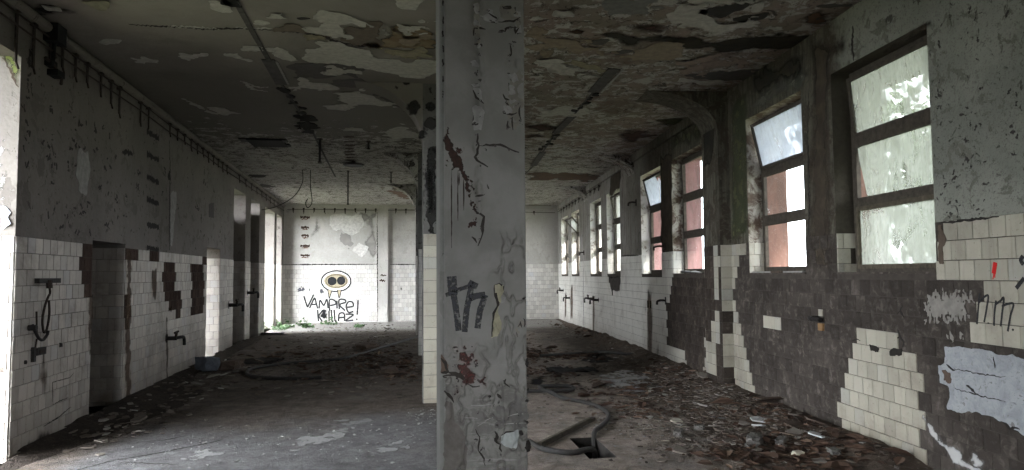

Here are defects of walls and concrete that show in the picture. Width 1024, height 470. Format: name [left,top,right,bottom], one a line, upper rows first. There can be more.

peeling [224,0,444,111]
peeling [471,2,590,167]
peeling [0,140,11,230]
peeling [330,212,369,257]
corrosion [443,127,477,248]
crack [472,194,485,246]
crack [474,133,519,167]
spalling [124,248,207,396]
peeling [666,234,1024,470]
flaking render [442,358,531,470]